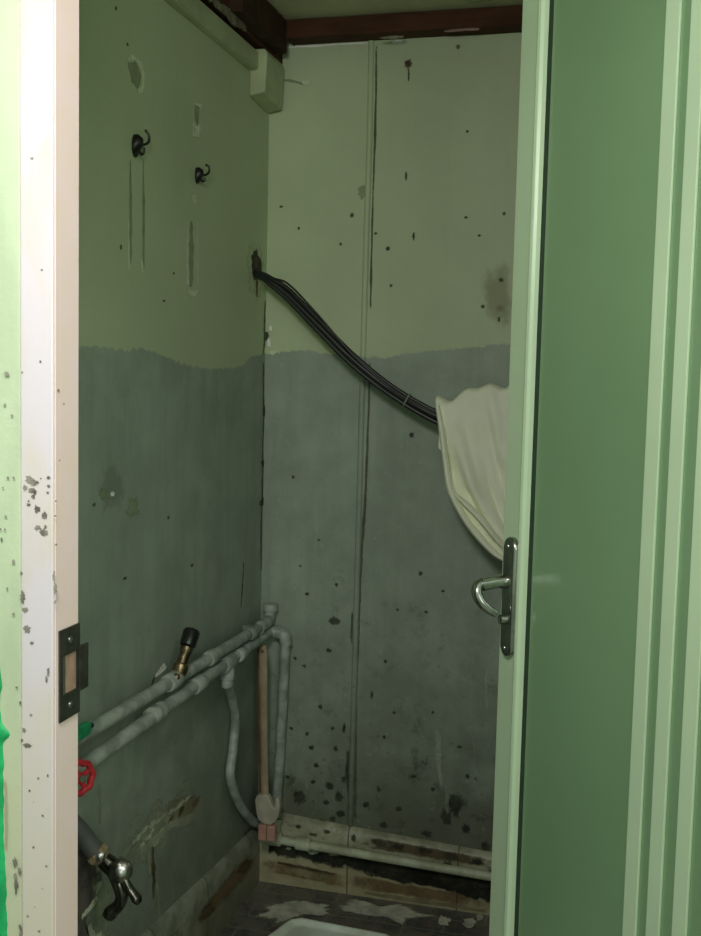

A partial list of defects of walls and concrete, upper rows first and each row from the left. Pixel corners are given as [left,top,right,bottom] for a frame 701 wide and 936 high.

peeling [121,780,200,874]
damp [320,776,346,822]
damp [441,795,463,824]
damp [268,845,491,902]